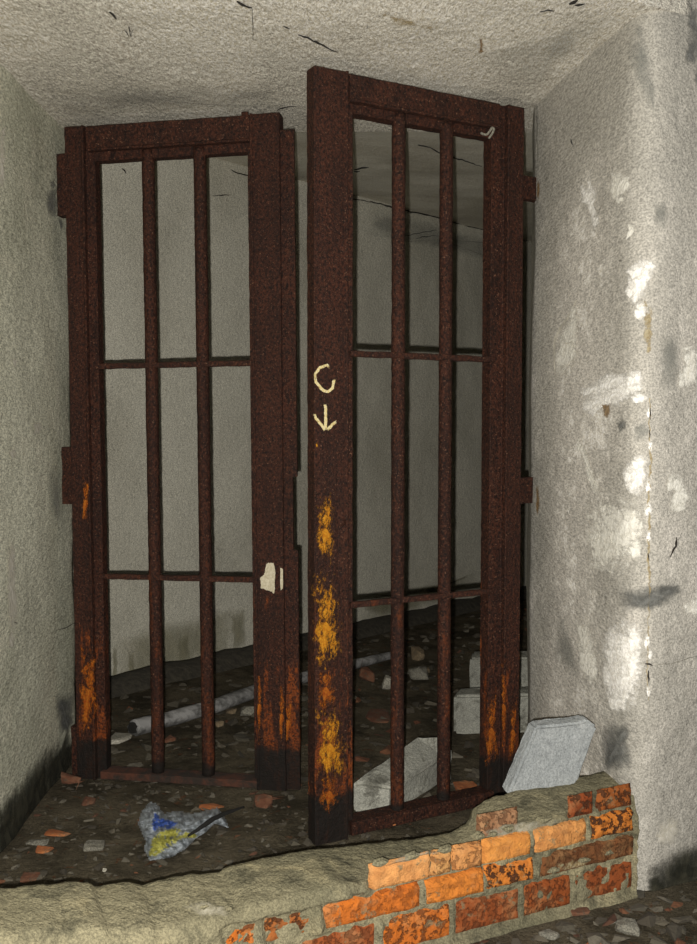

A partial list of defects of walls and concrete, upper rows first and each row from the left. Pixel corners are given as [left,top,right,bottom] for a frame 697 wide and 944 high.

crack [283,26,338,53]
corrosion [79,647,98,730]
corrosion [313,576,349,809]
flaking render [472,815,552,840]
flaking render [372,844,452,867]